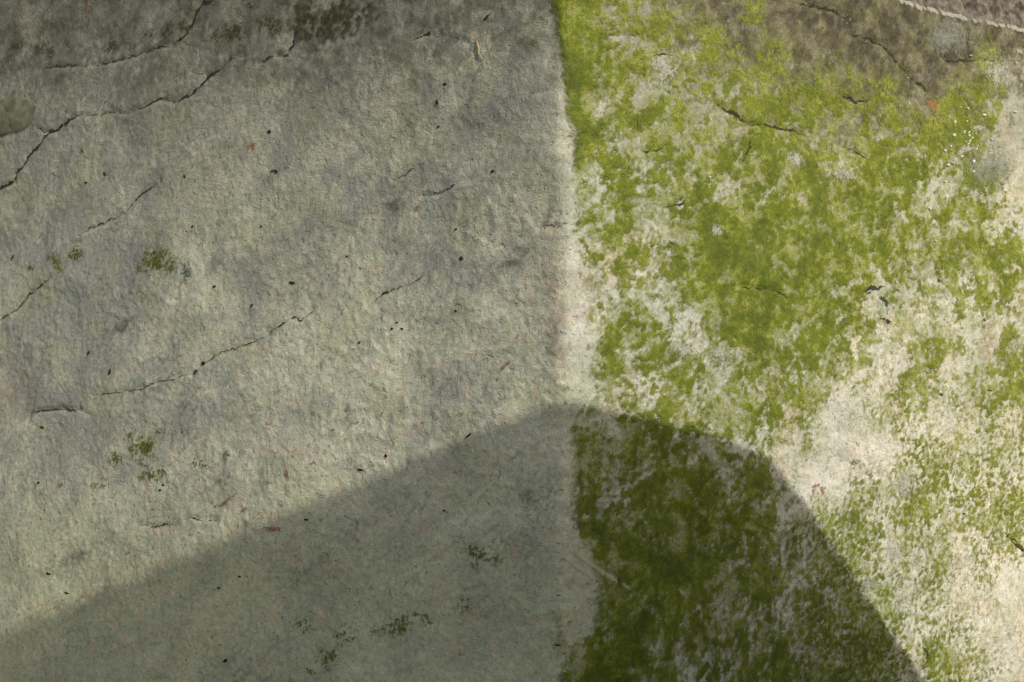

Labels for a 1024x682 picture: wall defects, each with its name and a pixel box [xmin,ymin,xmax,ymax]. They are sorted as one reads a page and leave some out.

crack [43,0,212,70]
crack [0,36,295,189]
crack [718,104,802,162]
damp [650,0,1024,158]
crack [796,1,926,91]
crack [85,180,161,232]
crack [30,312,311,419]